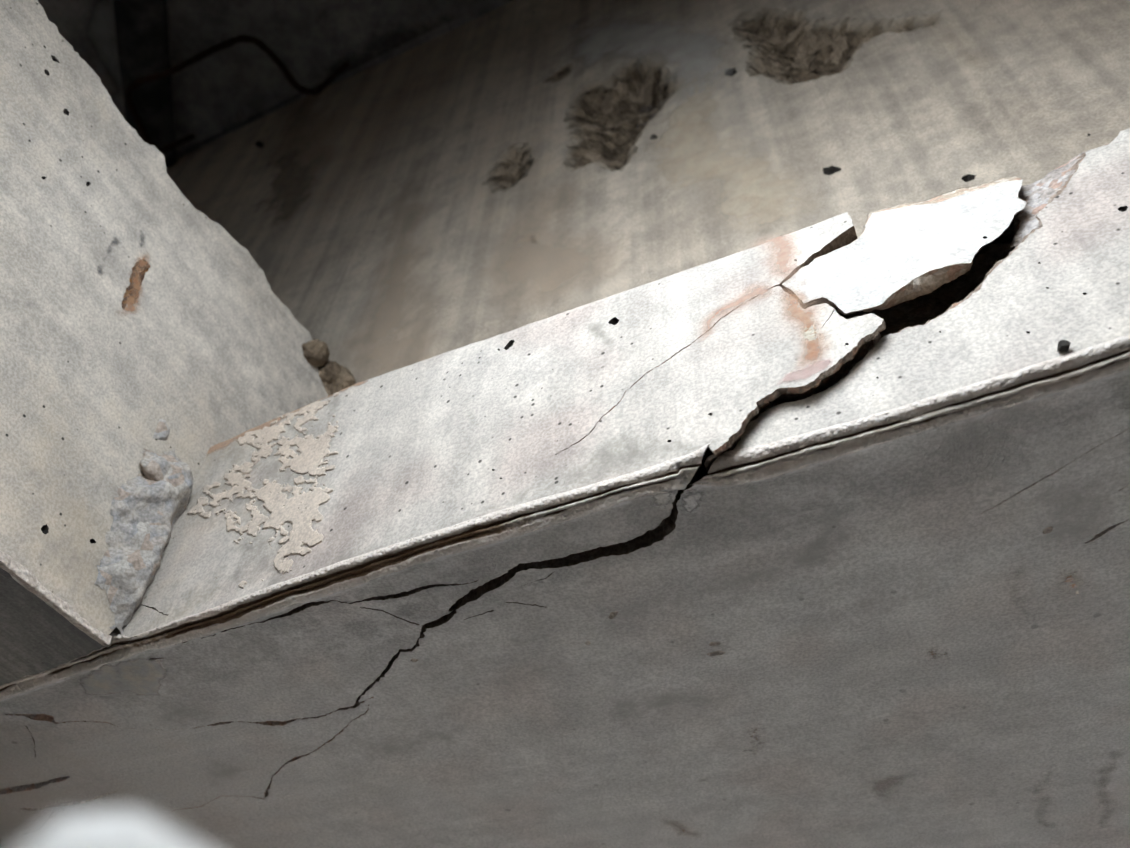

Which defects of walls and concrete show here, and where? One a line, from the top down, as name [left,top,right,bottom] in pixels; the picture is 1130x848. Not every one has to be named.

water stain [573,22,794,223]
rust [125,257,148,312]
crack [555,221,858,455]
rust [785,294,821,361]
crack [704,142,1111,474]
crack [5,714,156,757]
crack [149,490,679,818]